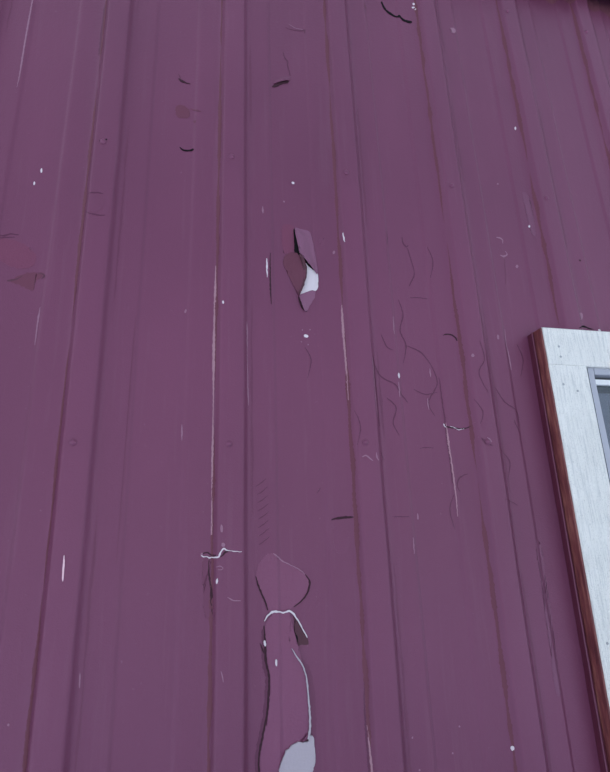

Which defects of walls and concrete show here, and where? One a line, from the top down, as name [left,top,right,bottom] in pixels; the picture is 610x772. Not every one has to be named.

peeling [301,264,318,294]
crack [201,548,242,614]
peeling [279,735,316,772]